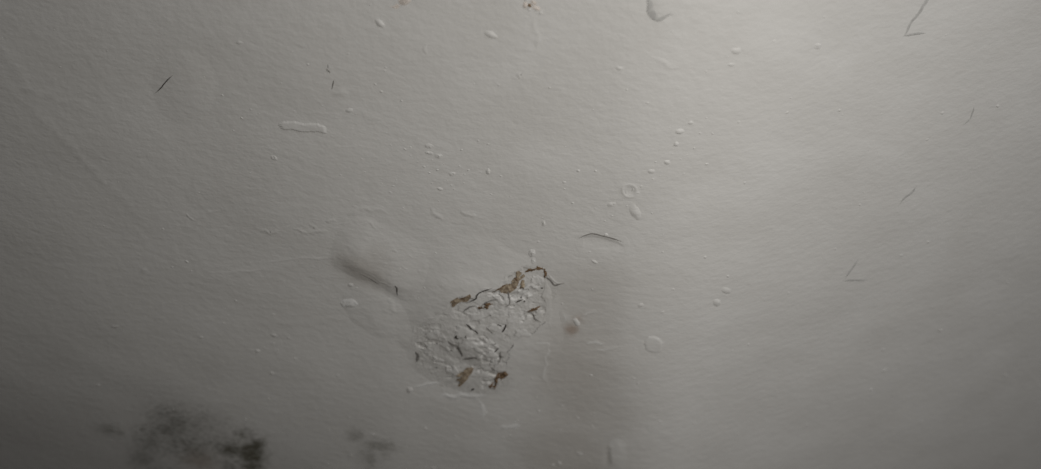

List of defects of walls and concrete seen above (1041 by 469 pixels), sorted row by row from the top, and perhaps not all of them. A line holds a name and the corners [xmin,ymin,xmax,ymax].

flaking render [409,264,559,395]